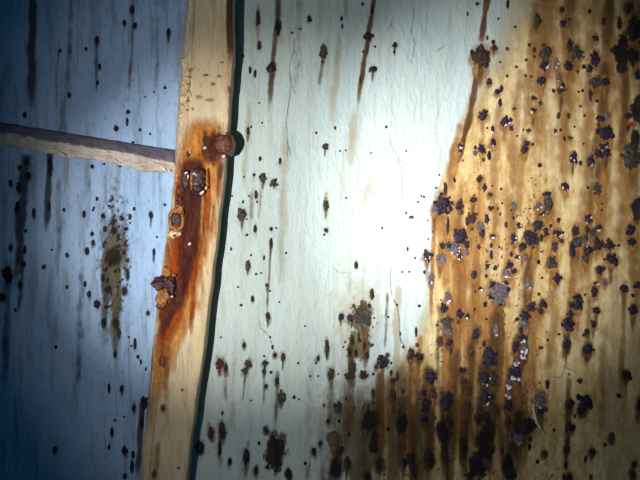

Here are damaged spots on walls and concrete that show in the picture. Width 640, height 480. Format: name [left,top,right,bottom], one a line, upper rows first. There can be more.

corrosion [266,0,281,99]
corrosion [136,121,224,430]
corrosion [321,0,640,480]